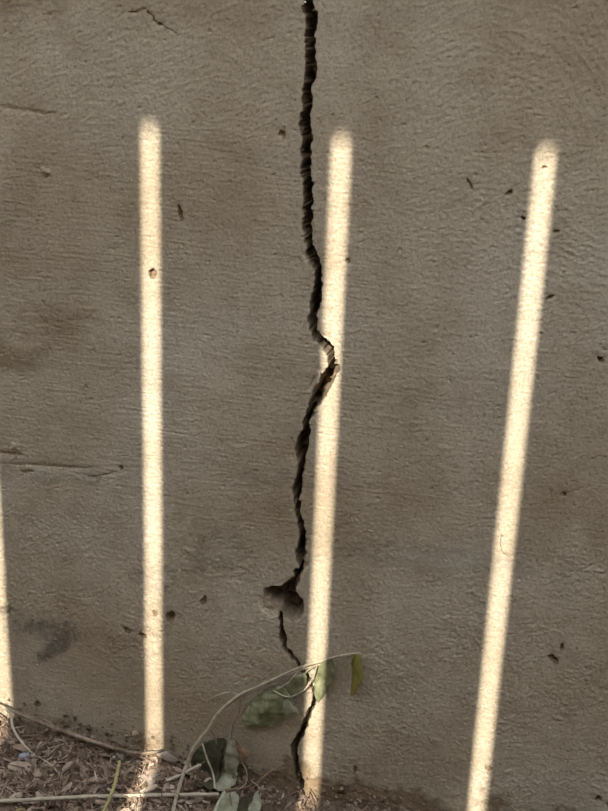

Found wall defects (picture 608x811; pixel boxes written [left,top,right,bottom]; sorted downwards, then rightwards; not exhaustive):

crack [287,0,341,588]
crack [278,610,317,795]